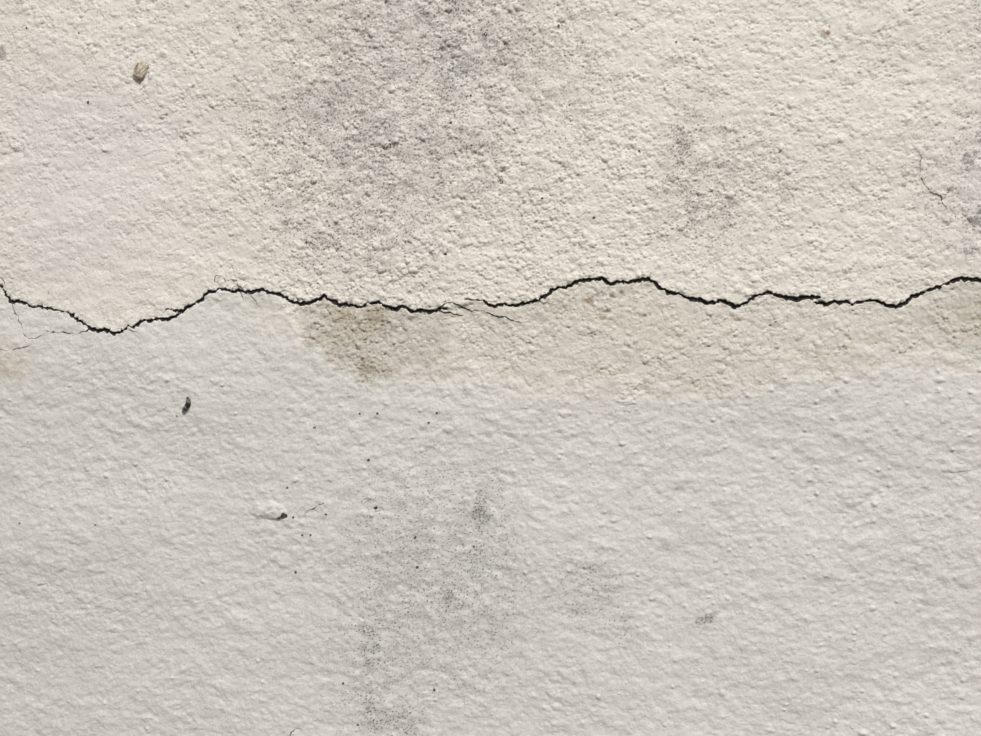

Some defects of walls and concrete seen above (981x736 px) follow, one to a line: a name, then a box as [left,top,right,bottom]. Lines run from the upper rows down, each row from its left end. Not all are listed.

crack [919,152,981,233]
crack [0,265,981,351]